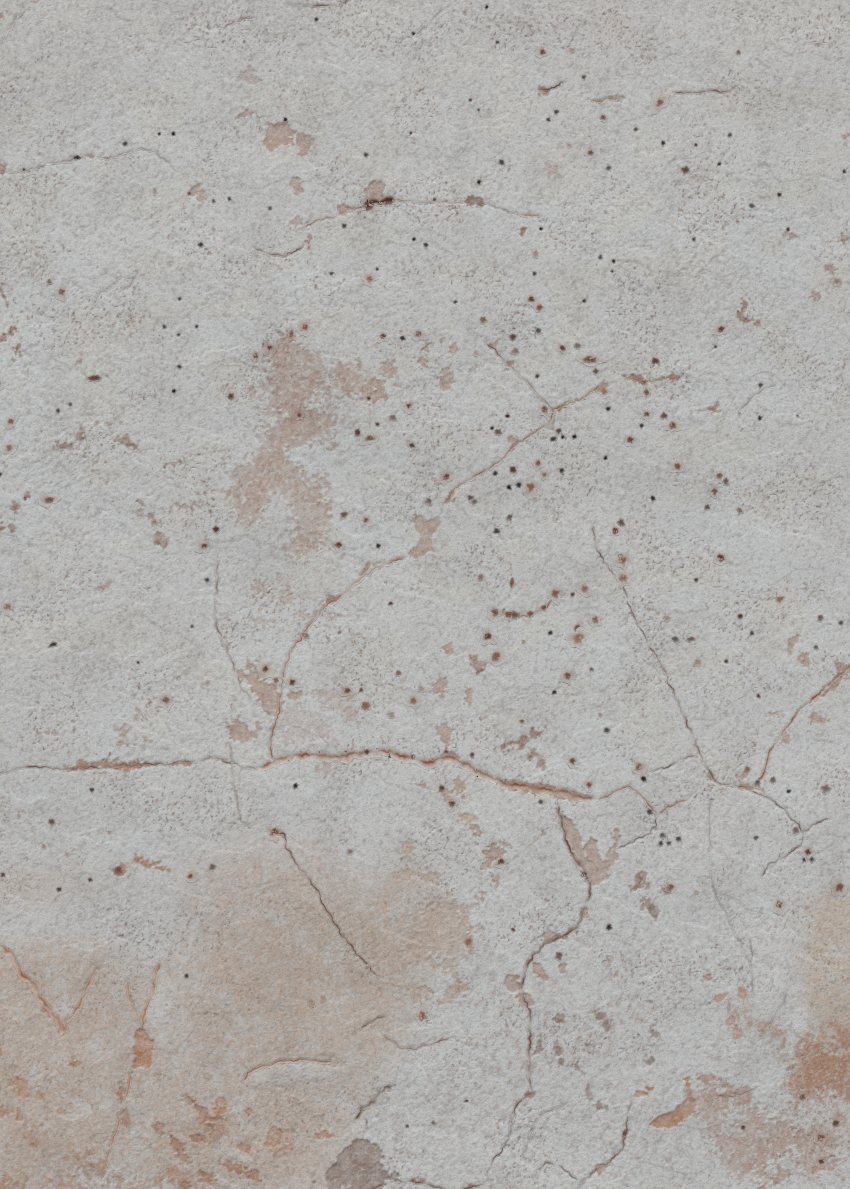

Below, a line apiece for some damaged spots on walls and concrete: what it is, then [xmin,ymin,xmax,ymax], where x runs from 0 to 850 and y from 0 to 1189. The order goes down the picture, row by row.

peeling [227,105,316,158]
crack [442,334,686,505]
crack [695,383,780,413]
crack [0,523,850,1189]
water stain [0,797,466,1189]
peeling [531,1037,609,1114]
peeling [591,1008,617,1035]
spalling [629,1084,656,1100]
peeling [642,1023,660,1068]
peeling [648,1071,850,1189]
water stain [766,1092,850,1160]
water stain [783,871,850,1057]